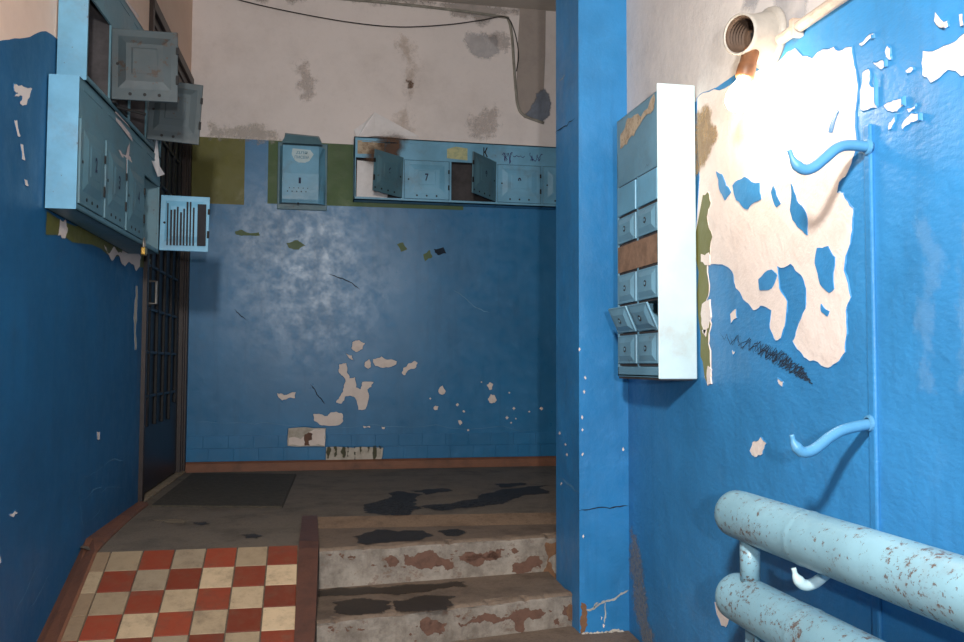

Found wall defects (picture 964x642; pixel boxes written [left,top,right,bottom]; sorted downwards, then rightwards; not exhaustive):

peeling [905,13,964,84]
peeling [13,83,32,106]
peeling [696,32,923,386]
peeling [277,392,296,400]
peeling [287,340,418,460]
peeling [486,382,497,404]
damp [363,483,549,516]
crack [559,477,627,511]
damp [354,529,465,545]
peeling [371,542,556,579]
crack [587,590,628,623]